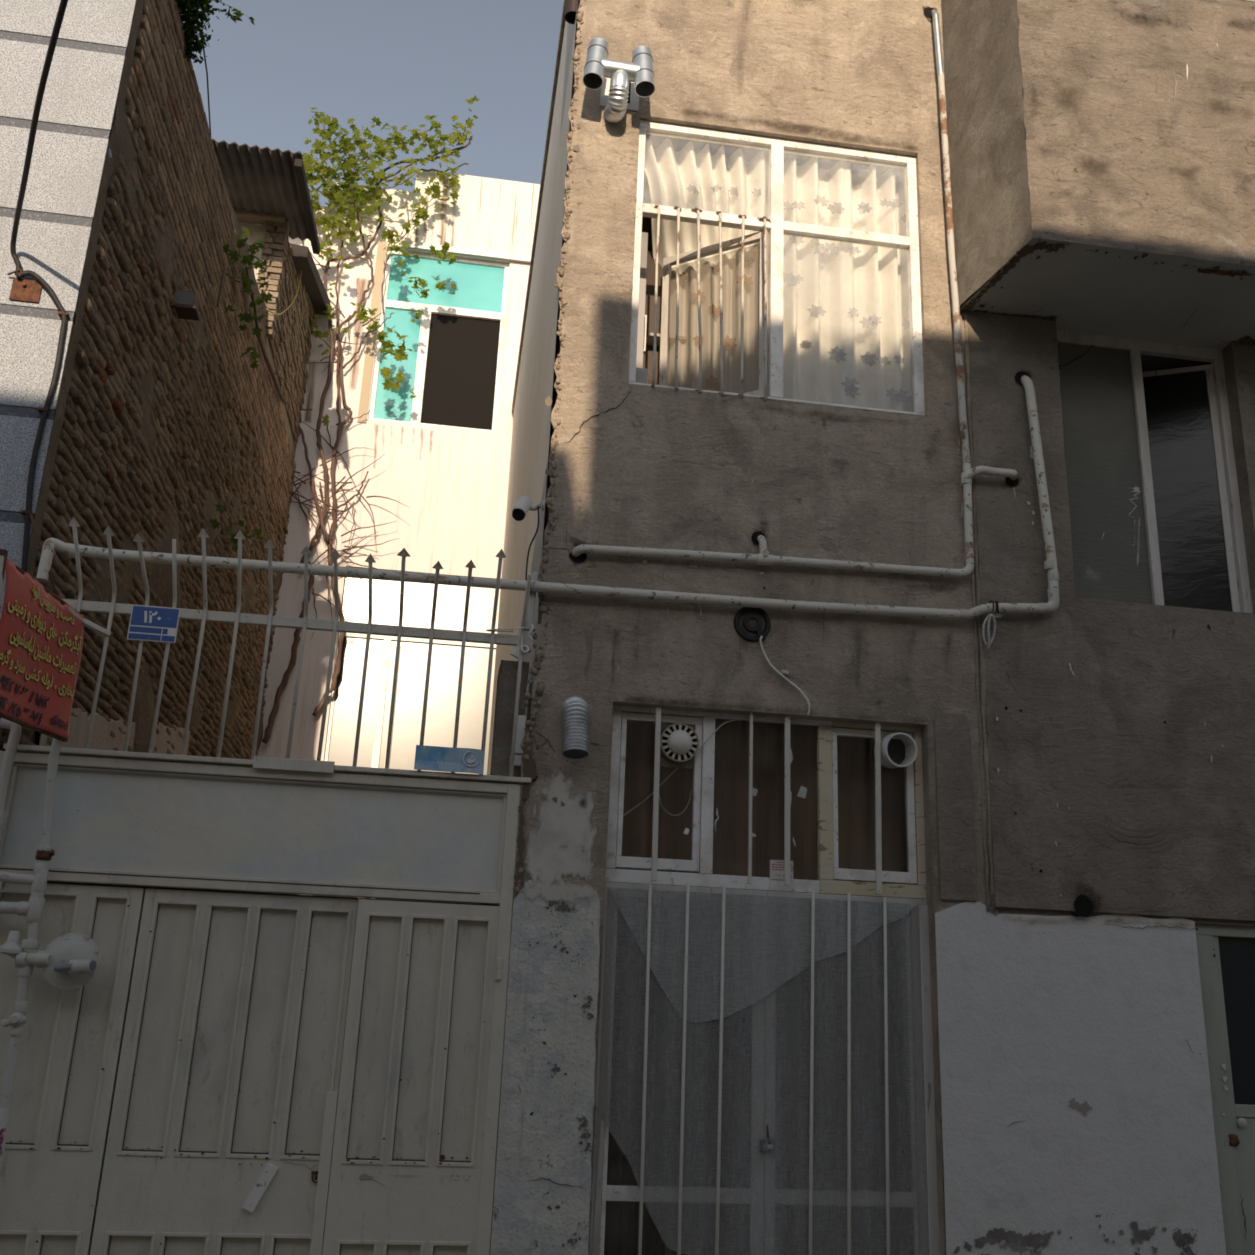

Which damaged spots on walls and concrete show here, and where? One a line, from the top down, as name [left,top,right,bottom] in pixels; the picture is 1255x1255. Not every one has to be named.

crack [548,388,631,461]
peeling [490,0,600,1255]
peeling [954,1228,1072,1255]
peeling [1095,1213,1198,1255]